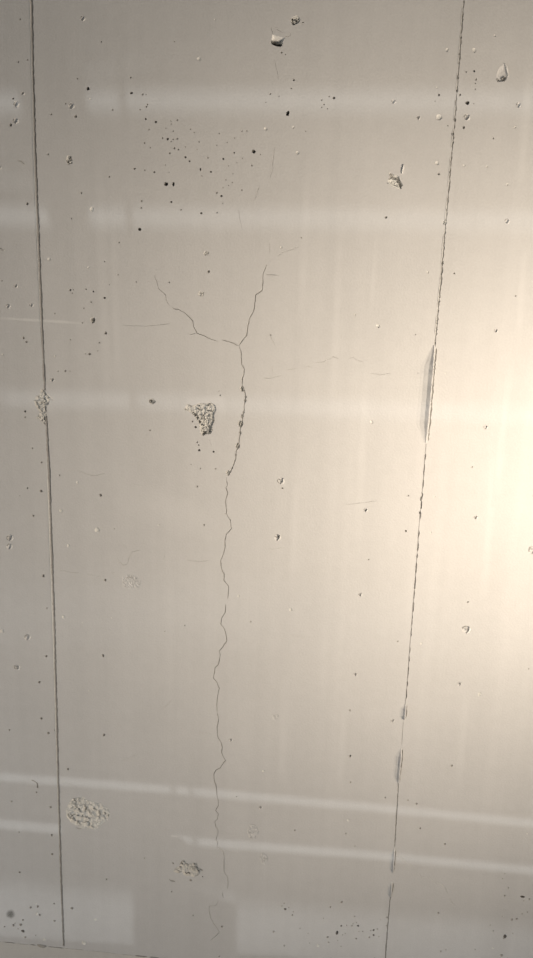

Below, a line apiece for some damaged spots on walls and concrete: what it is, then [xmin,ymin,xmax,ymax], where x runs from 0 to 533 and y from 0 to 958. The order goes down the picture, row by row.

spalling [184,391,221,451]
crack [125,242,298,941]
spalling [66,797,111,829]